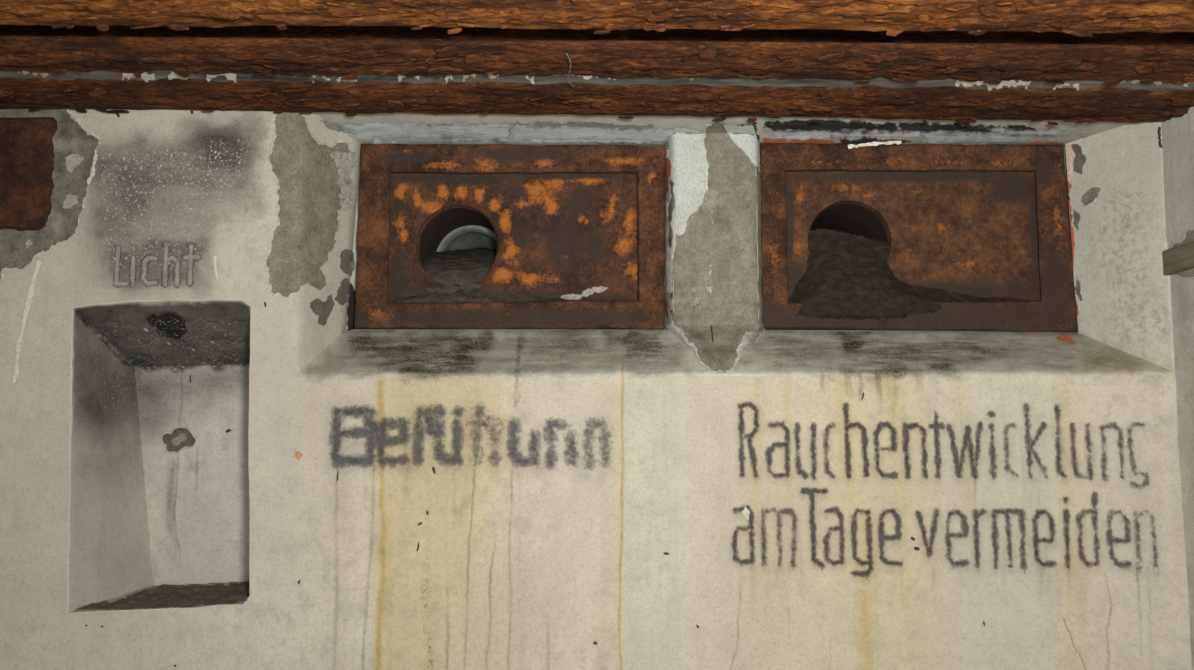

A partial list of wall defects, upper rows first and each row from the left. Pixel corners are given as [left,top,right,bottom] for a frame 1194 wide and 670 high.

spalling [0,109,101,282]
spalling [264,112,356,326]
spalling [665,121,834,373]
peeling [848,141,902,149]